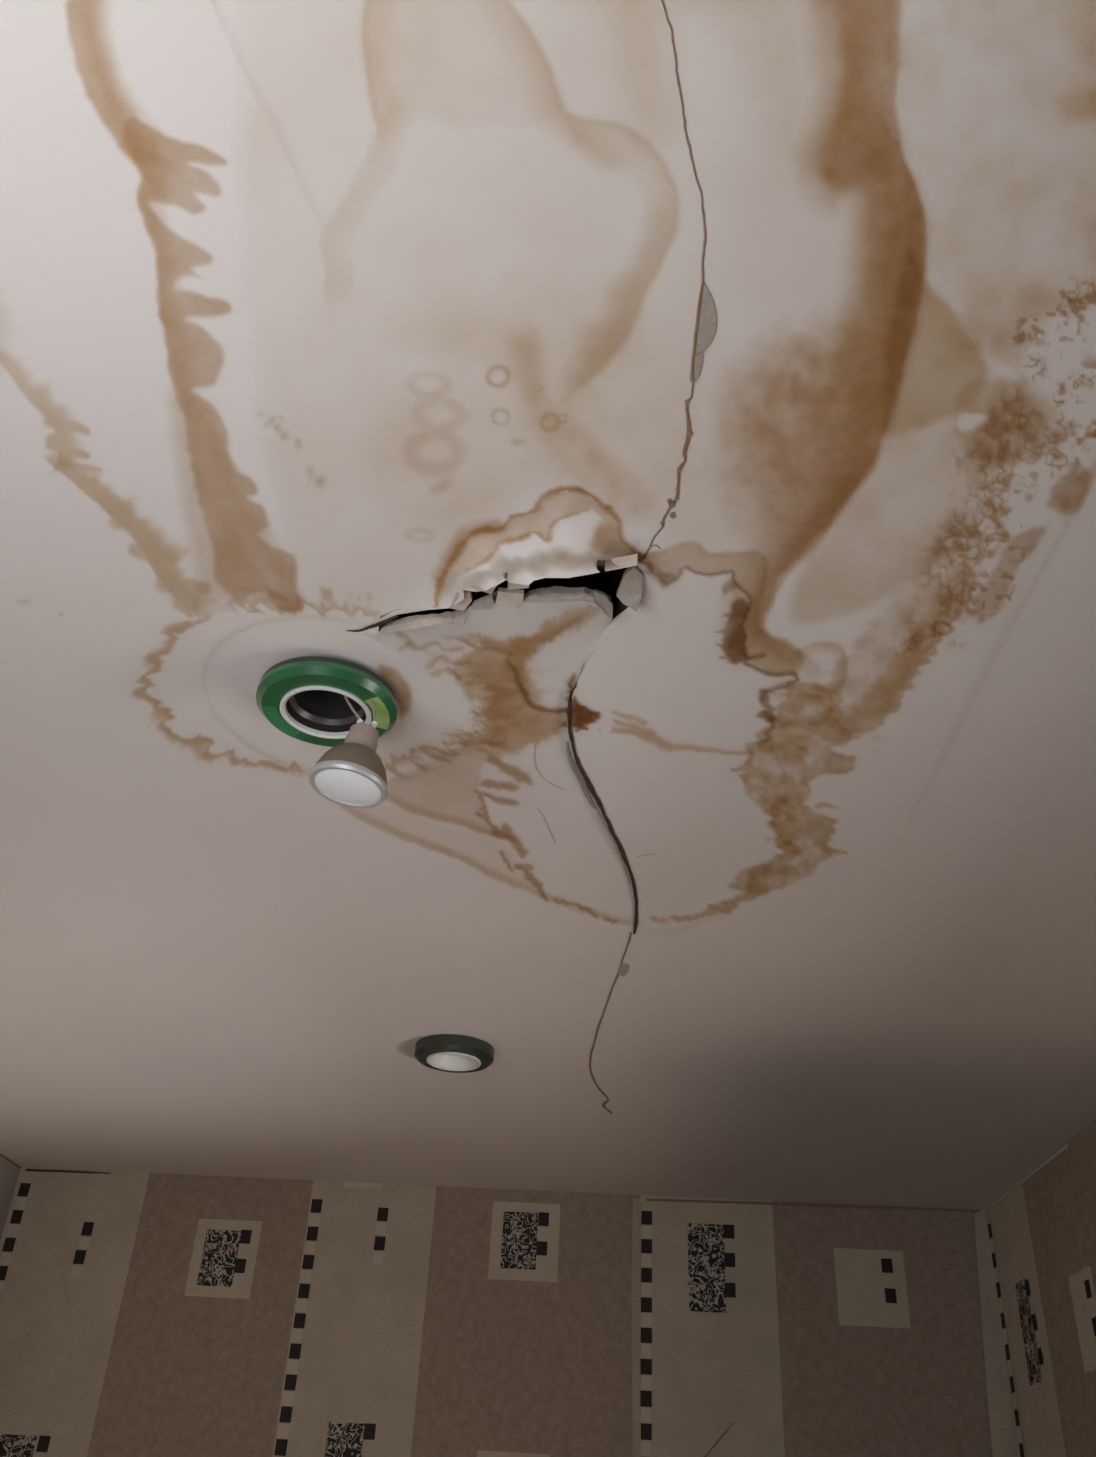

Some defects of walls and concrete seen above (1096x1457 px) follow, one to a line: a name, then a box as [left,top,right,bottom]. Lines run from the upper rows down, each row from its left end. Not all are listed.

crack [661,0,706,282]
crack [347,382,694,635]
crack [534,663,656,1114]